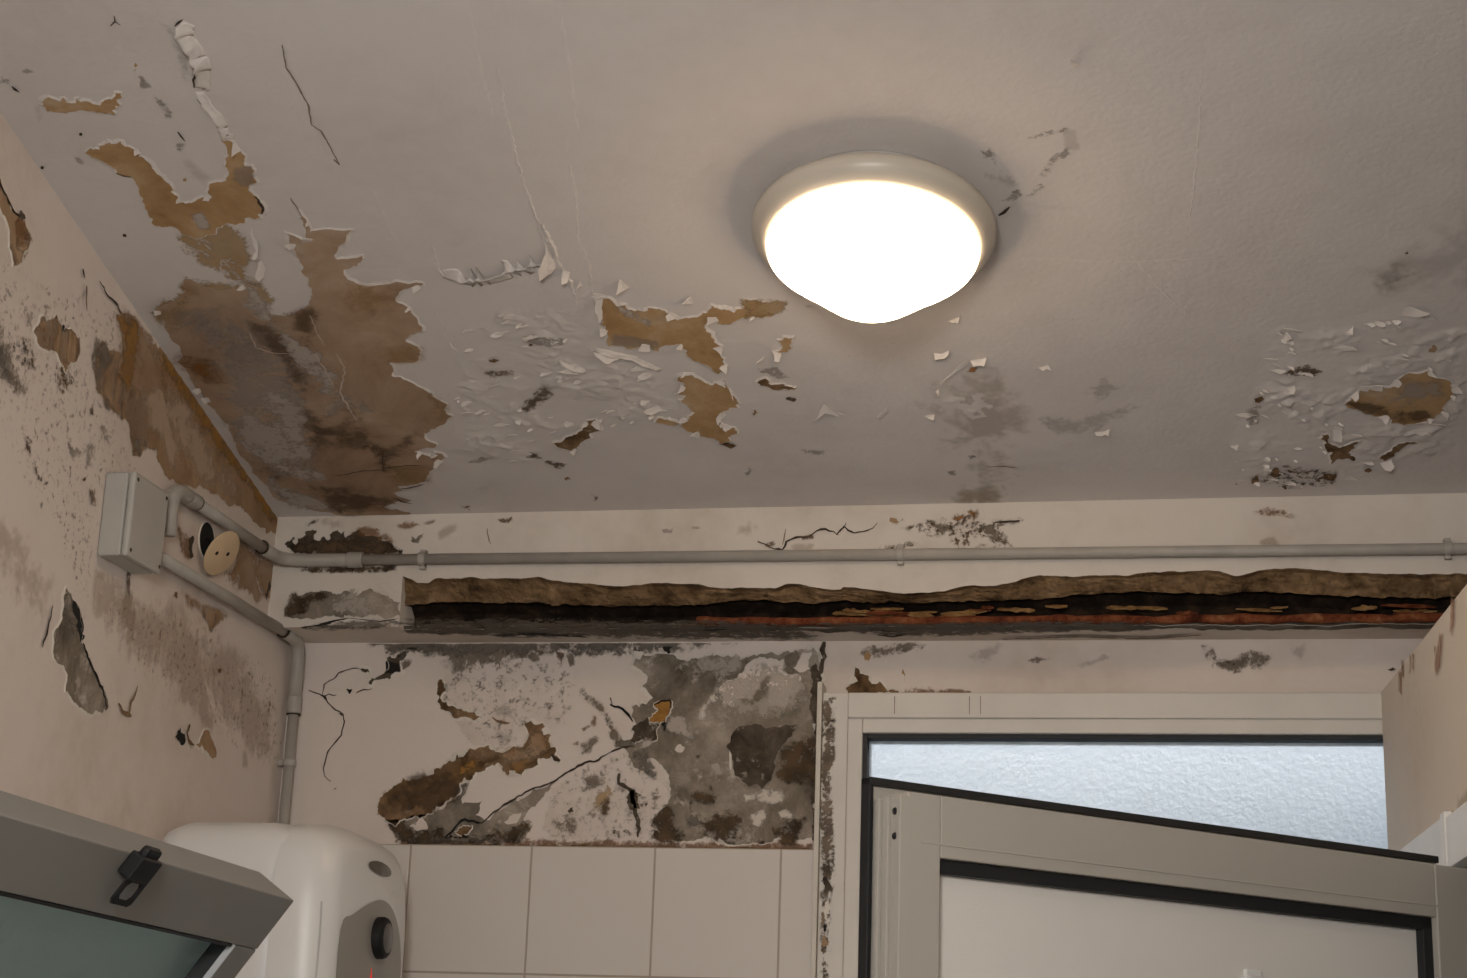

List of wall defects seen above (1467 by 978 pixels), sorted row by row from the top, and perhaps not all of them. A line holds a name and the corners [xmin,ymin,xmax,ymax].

crack [281,45,340,165]
peeling [0,177,31,269]
peeling [84,20,455,516]
damp [0,269,434,579]
peeling [591,293,787,449]
peeling [1236,345,1463,490]
damp [229,539,273,602]
crack [758,523,877,550]
peeling [42,586,138,718]
damp [110,572,270,726]
crack [309,668,371,789]
spalling [283,565,1467,848]